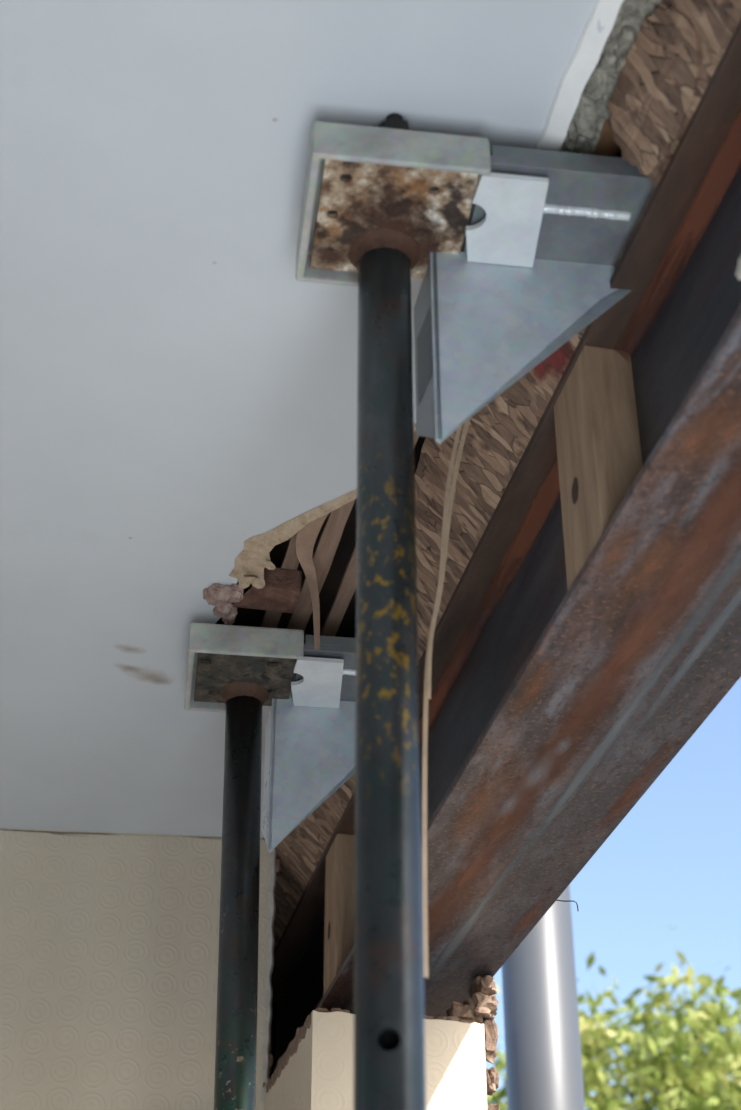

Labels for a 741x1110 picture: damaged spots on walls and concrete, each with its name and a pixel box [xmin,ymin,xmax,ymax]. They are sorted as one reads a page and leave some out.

rust [311,245,345,263]
rust [352,197,436,266]
rust [645,109,741,316]
rust [491,458,560,603]
spalling [203,567,302,625]
rust [419,631,475,750]
spalling [424,975,500,1110]